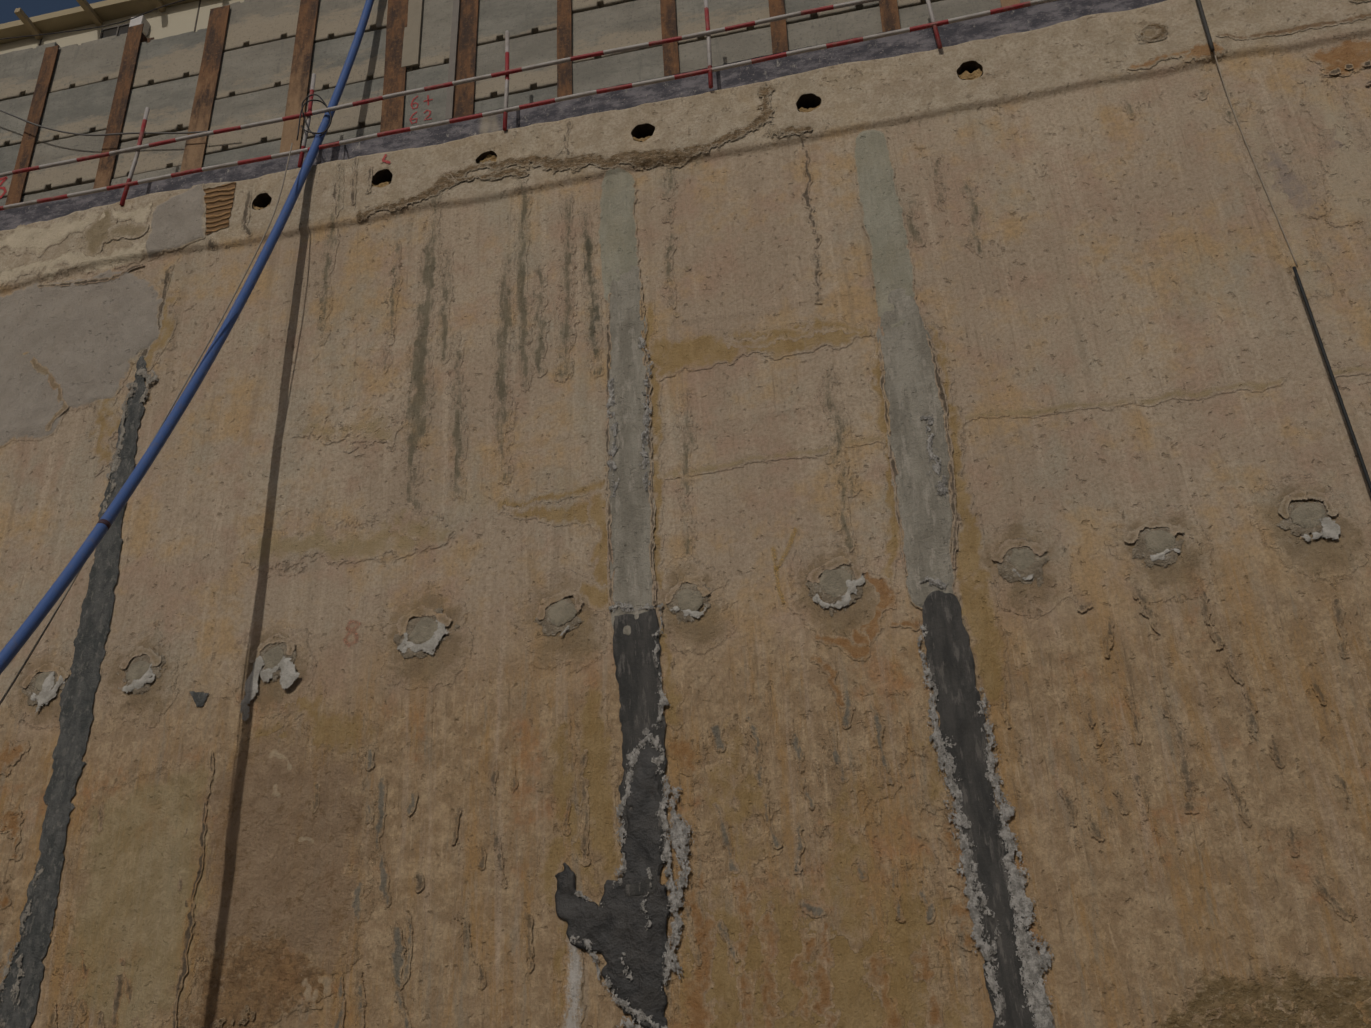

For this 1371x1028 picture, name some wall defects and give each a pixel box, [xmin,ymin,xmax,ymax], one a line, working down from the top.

water stain [376,190,470,512]
water stain [490,177,604,485]
efflorescence [556,934,586,1028]